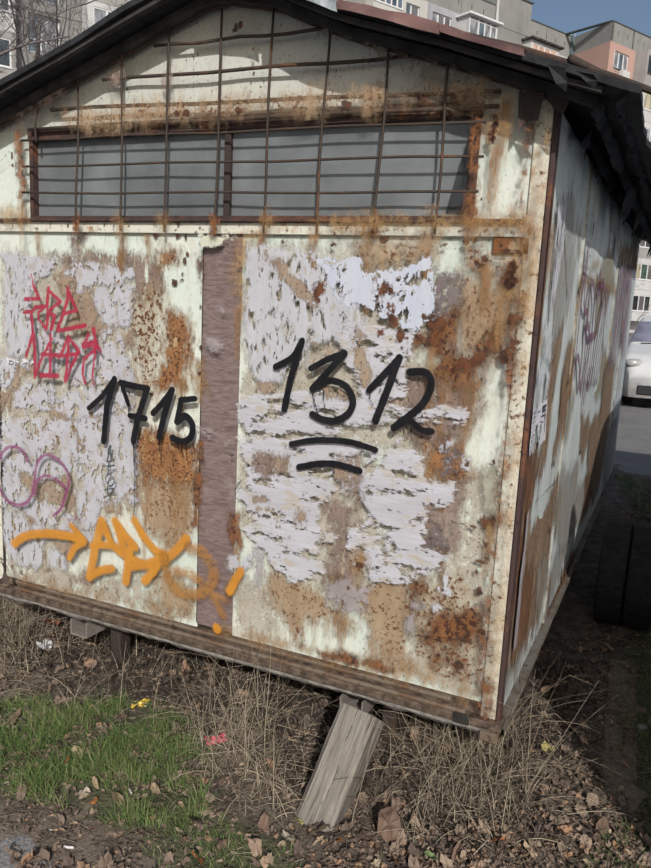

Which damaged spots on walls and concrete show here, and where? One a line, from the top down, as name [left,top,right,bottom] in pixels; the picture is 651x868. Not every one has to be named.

rust [109,61,124,91]
rust [63,69,388,129]
rust [0,86,68,221]
rust [209,213,220,236]
rust [248,75,637,721]